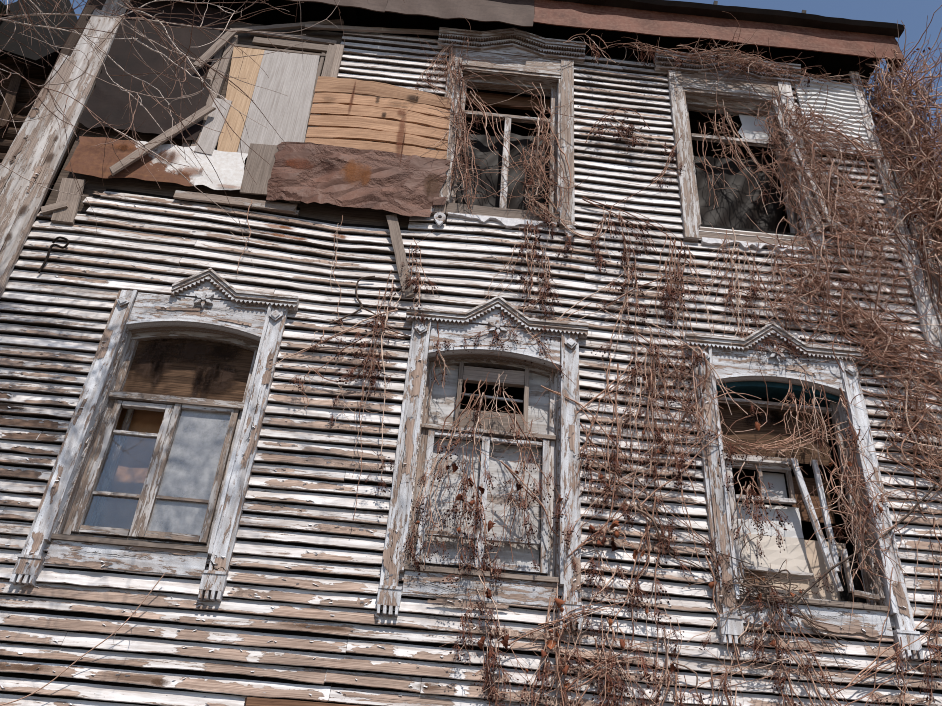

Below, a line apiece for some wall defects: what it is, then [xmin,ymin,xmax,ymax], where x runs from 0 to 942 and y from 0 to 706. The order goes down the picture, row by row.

rust [158,151,203,174]
peeling [24,244,167,283]
leakage [137,338,241,395]
peeling [0,329,113,503]
peeling [125,546,198,556]
peeling [590,525,703,554]
peeling [899,505,942,599]
peeling [0,550,646,706]
peeling [465,623,679,685]
peeling [752,620,897,657]
peeling [892,582,910,618]
peeling [868,609,942,705]